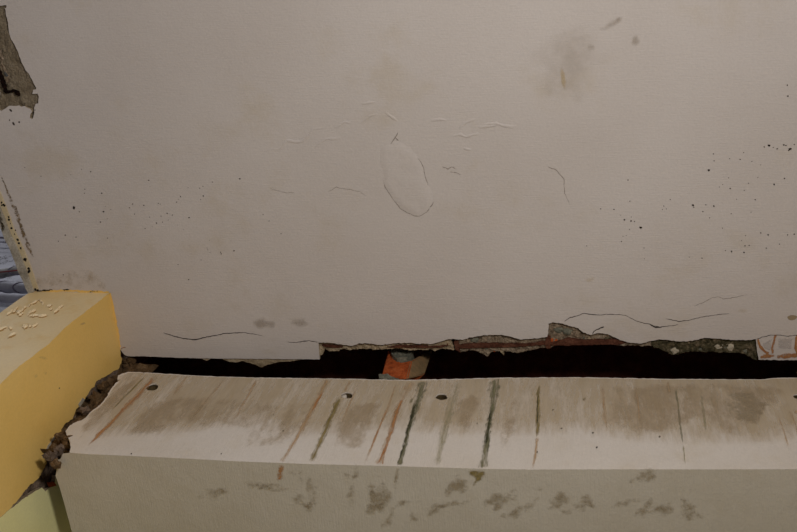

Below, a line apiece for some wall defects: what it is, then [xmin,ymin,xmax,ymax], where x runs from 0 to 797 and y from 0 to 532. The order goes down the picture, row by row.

spalling [0,5,39,125]
water stain [0,178,32,273]
crack [165,332,262,340]
spalling [223,359,301,367]
spalling [319,322,757,360]
crack [565,313,729,333]
corrosion [757,335,797,359]
water stain [108,373,514,483]
corrosion [370,391,402,464]
water stain [522,378,561,464]
water stain [565,378,797,459]